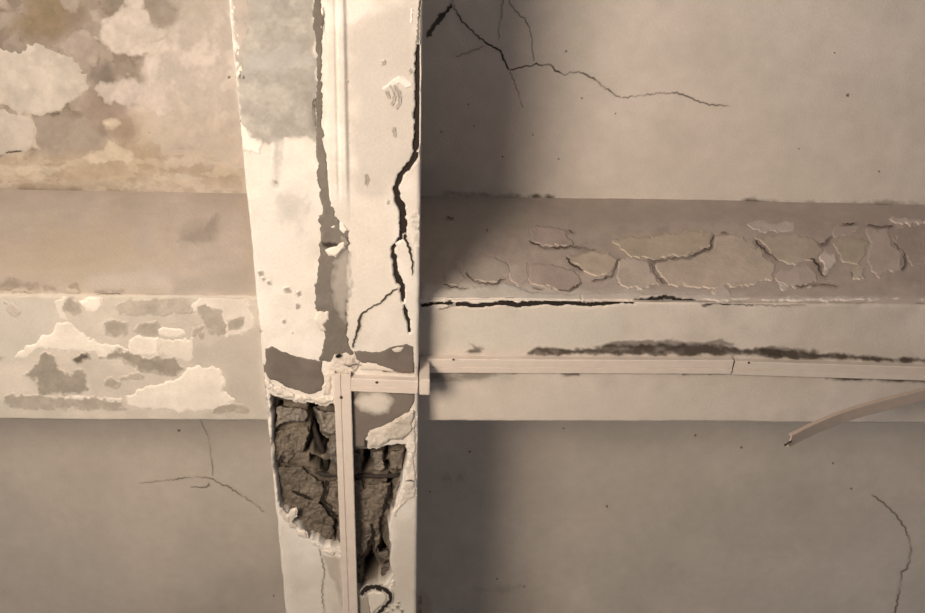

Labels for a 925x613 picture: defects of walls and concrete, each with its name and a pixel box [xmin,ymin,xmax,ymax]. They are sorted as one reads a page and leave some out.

peeling [0,0,179,177]
flaking render [229,0,326,155]
crack [342,0,804,370]
peeling [421,203,925,304]
leakage [462,340,485,355]
leakage [430,373,518,384]
leakage [525,336,925,364]
leakage [822,377,925,386]
crack [138,420,264,513]
crack [358,583,393,613]
spalling [353,411,418,613]
crack [871,494,913,613]